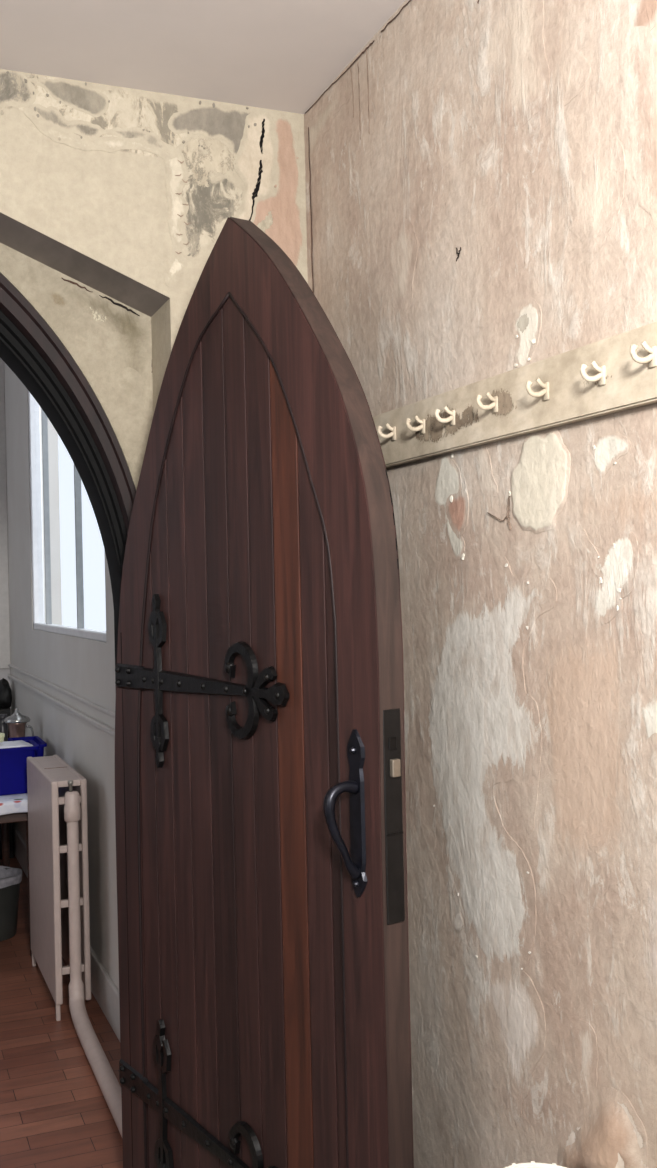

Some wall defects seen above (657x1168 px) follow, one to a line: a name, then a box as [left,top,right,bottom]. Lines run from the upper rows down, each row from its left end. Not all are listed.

peeling [631,0,657,31]
peeling [0,69,306,287]
crack [249,119,265,221]
crack [305,0,411,293]
crack [62,278,140,316]
peeling [510,297,542,368]
peeling [422,430,657,974]